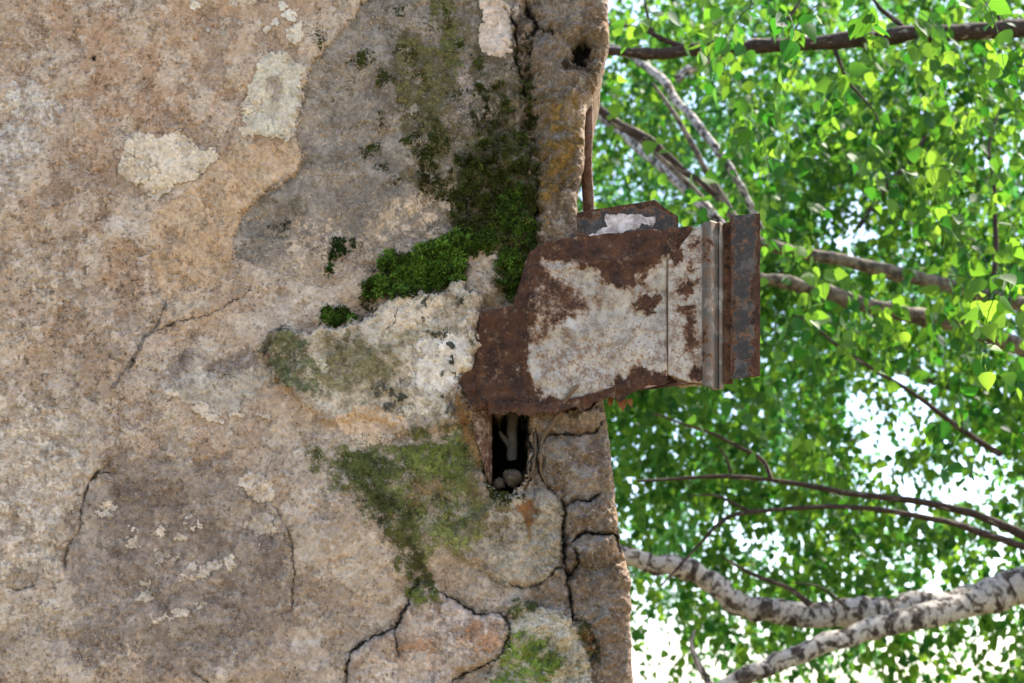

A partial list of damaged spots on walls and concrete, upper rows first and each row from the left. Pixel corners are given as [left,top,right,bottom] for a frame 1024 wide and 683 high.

crack [110,284,252,389]
rust [488,381,645,417]
spalling [346,409,597,683]
crack [503,420,620,620]
crack [344,584,418,682]
crack [445,594,511,681]